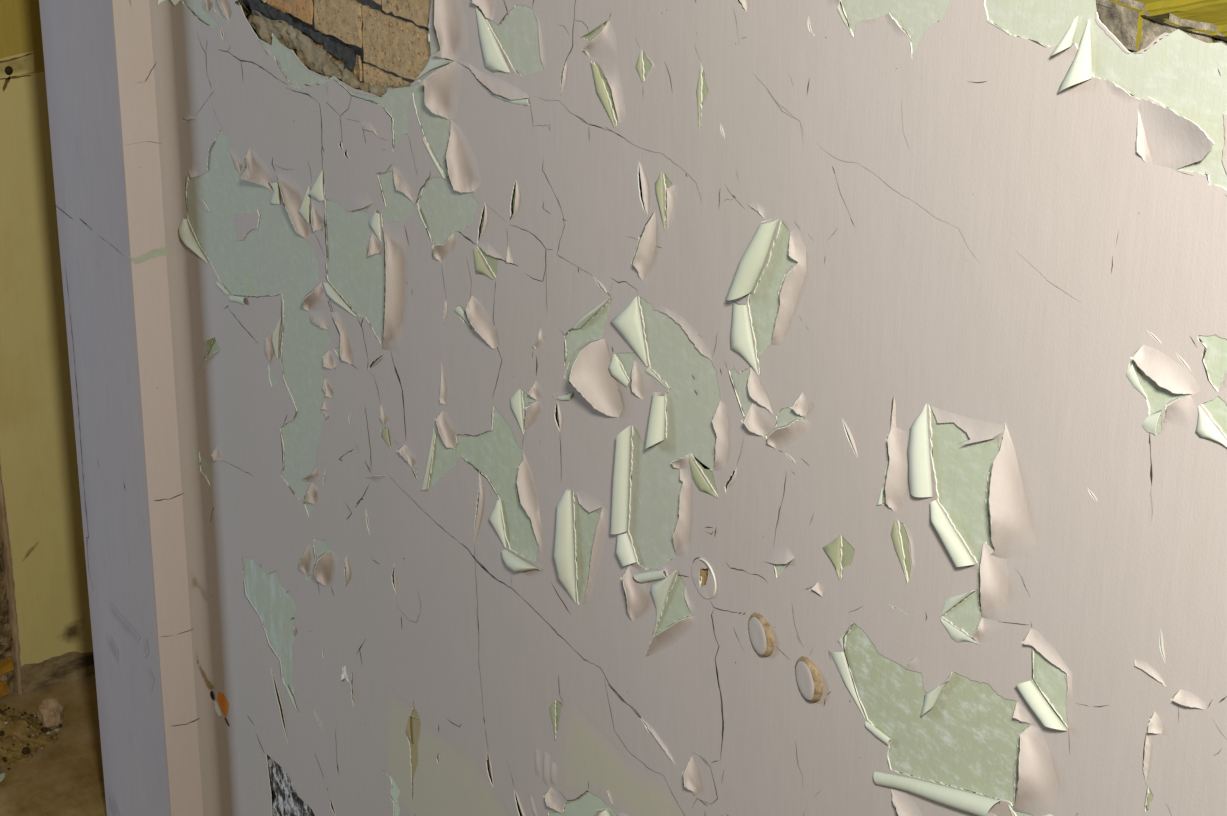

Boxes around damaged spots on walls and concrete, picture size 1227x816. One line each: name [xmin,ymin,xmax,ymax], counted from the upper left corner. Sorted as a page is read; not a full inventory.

peeling [129,0,547,515]
crack [496,166,636,304]
crack [529,0,744,210]
crack [757,74,978,264]
peeling [985,0,1227,196]
crack [338,318,406,492]
peeling [380,203,813,657]
peeling [1126,335,1227,447]
spalling [0,469,23,697]
crack [426,513,685,816]
crack [693,527,767,783]
peeling [823,396,1072,816]